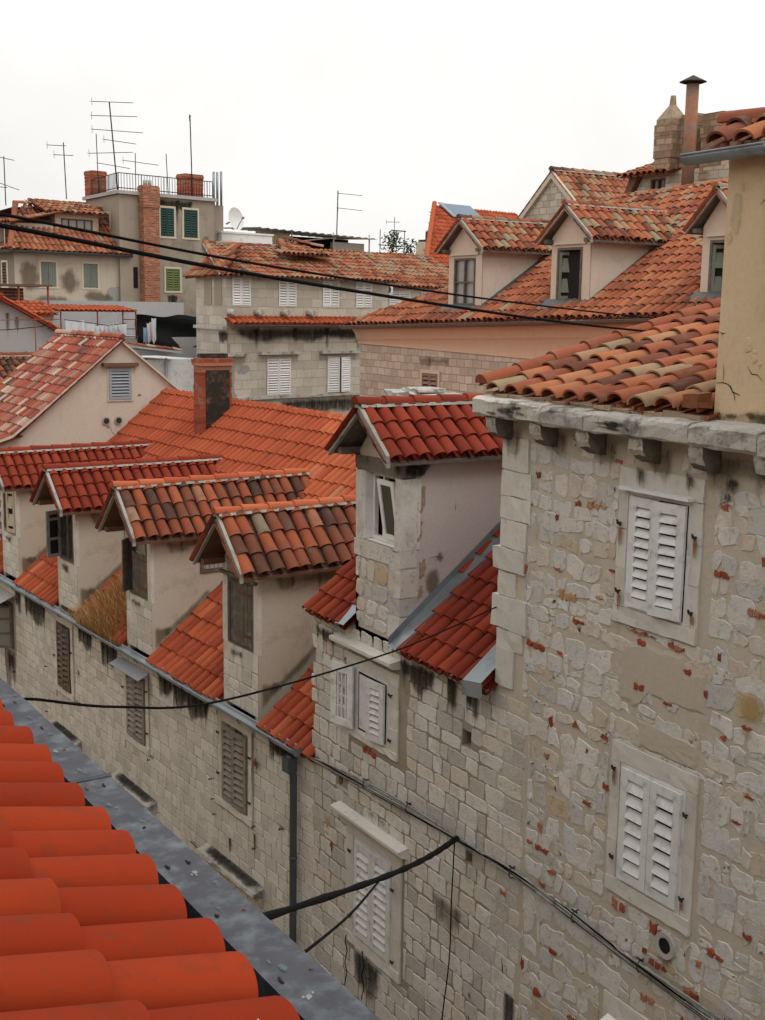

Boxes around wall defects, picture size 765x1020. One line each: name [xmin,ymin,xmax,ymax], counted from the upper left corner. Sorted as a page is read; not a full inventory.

crack [718,365,761,400]
leakage [354,951,377,995]
leakage [504,993,513,1020]